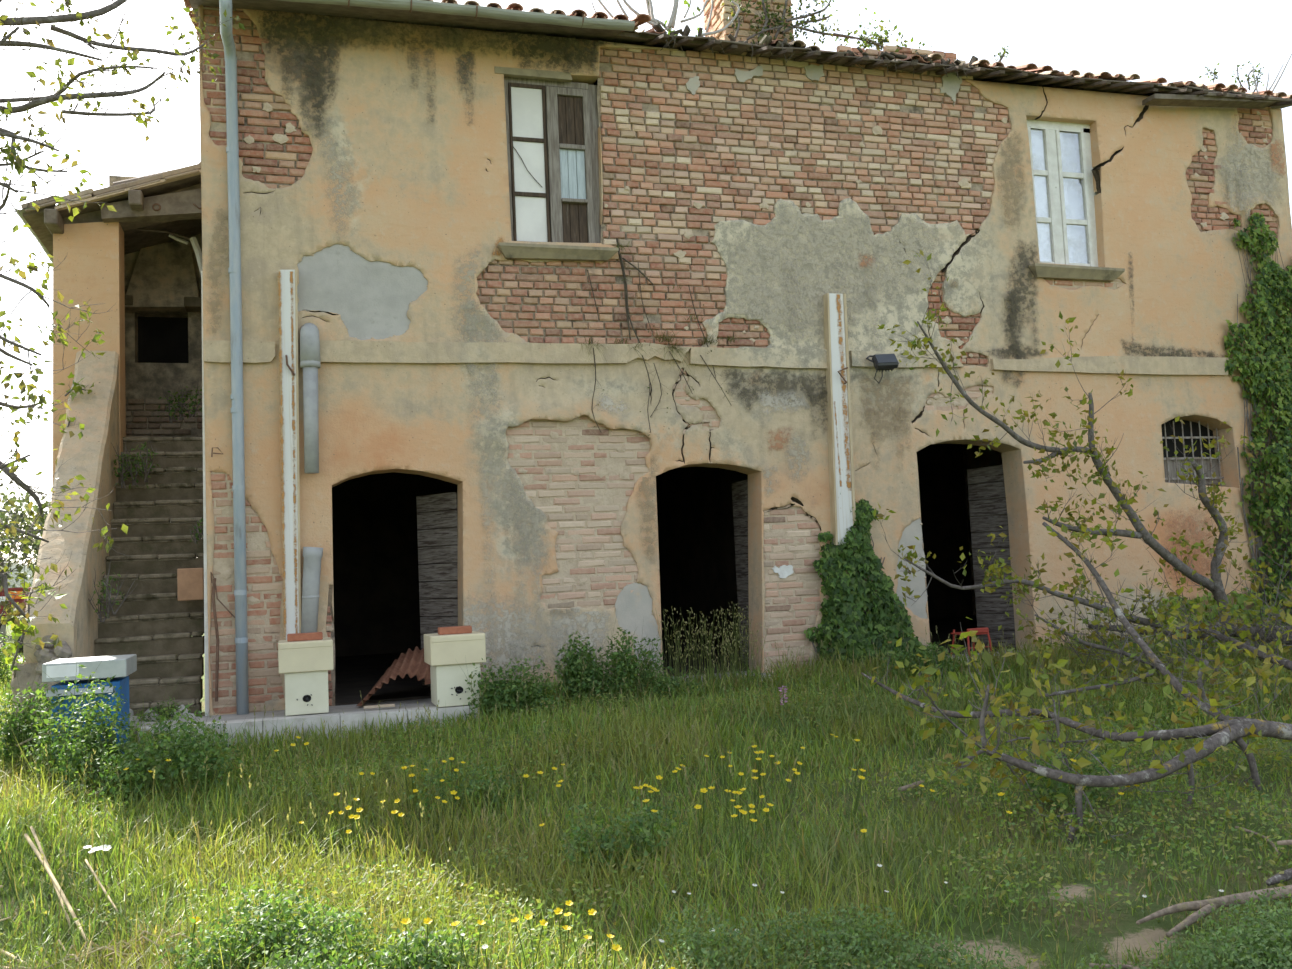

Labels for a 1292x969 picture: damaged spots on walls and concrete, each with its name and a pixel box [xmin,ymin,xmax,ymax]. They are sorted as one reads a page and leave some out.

flaking render [200,6,313,188]
damp [263,12,604,228]
flaking render [476,45,1011,348]
crack [1091,92,1157,194]
flaking render [1186,129,1278,238]
flaking render [1234,107,1272,148]
peeling [297,244,428,340]
flaking render [927,270,988,367]
flaking render [922,385,993,411]
flaking render [506,416,661,671]
flaking render [763,504,822,672]